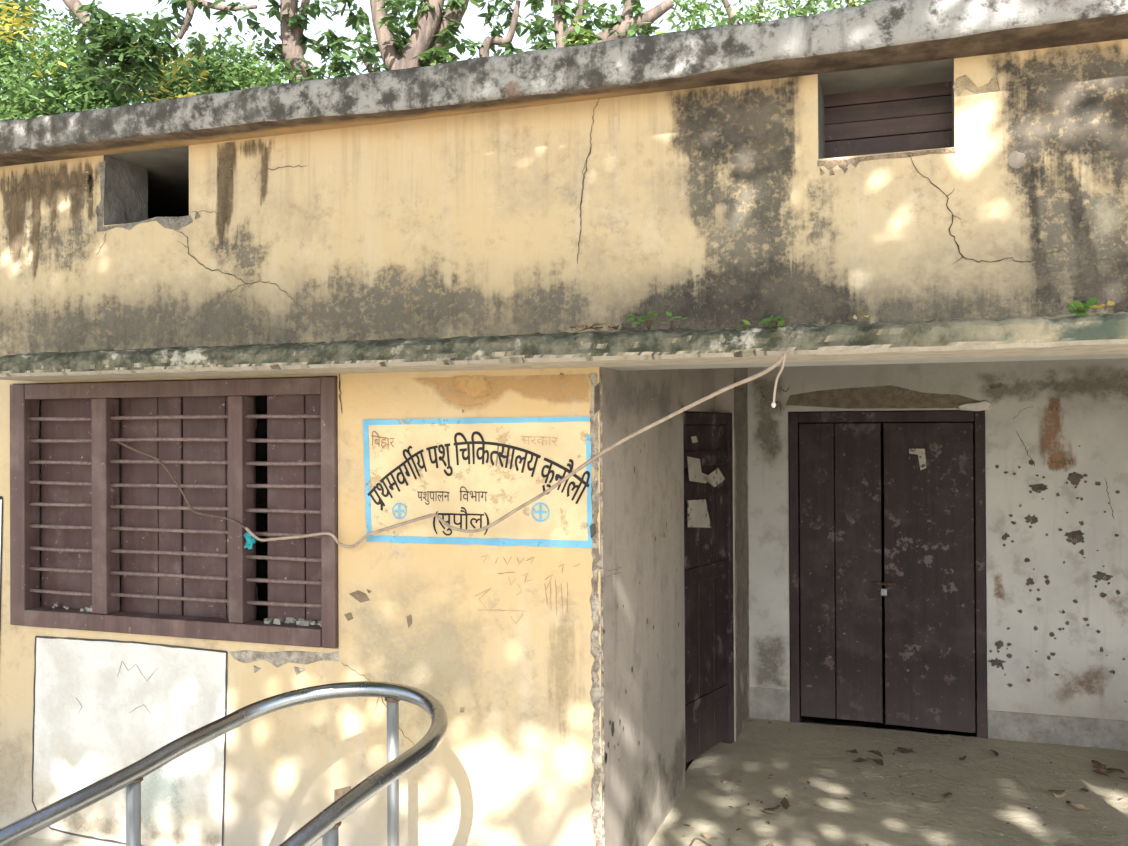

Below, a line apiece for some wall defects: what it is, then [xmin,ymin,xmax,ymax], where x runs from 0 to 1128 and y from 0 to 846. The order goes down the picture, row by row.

water stain [0,163,98,275]
water stain [213,140,268,276]
crack [577,100,599,264]
water stain [623,76,858,331]
water stain [878,45,1128,322]
crack [909,156,1115,264]
water stain [0,266,589,351]
peeling [785,383,1003,411]
rust [1041,398,1074,469]
peeling [995,459,1101,559]
flaking render [589,373,624,846]
peeling [987,627,1031,688]